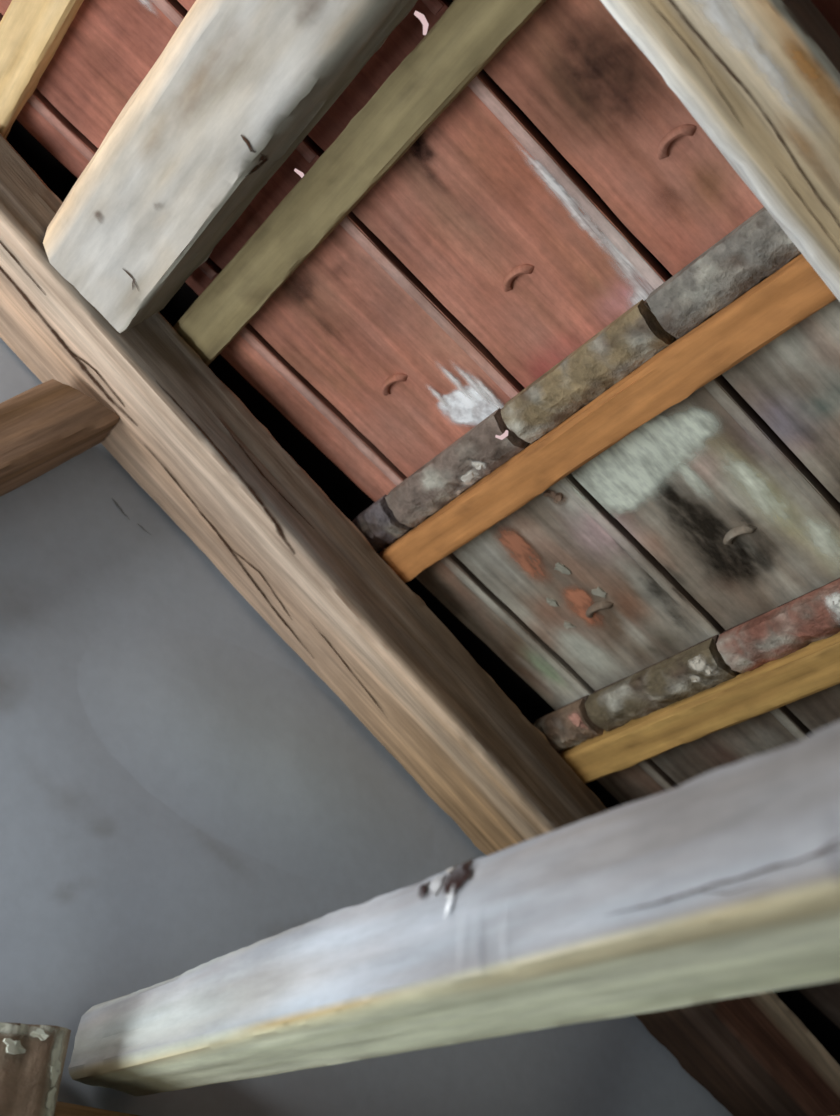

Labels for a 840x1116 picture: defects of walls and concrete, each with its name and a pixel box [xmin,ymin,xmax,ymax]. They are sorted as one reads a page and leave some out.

crack [649,0,840,252]
leakage [430,369,503,424]
crack [0,242,386,716]
leakage [575,409,716,513]
leakage [734,464,784,515]
leakage [810,523,840,554]
crack [612,838,840,914]
peeling [0,1022,63,1116]